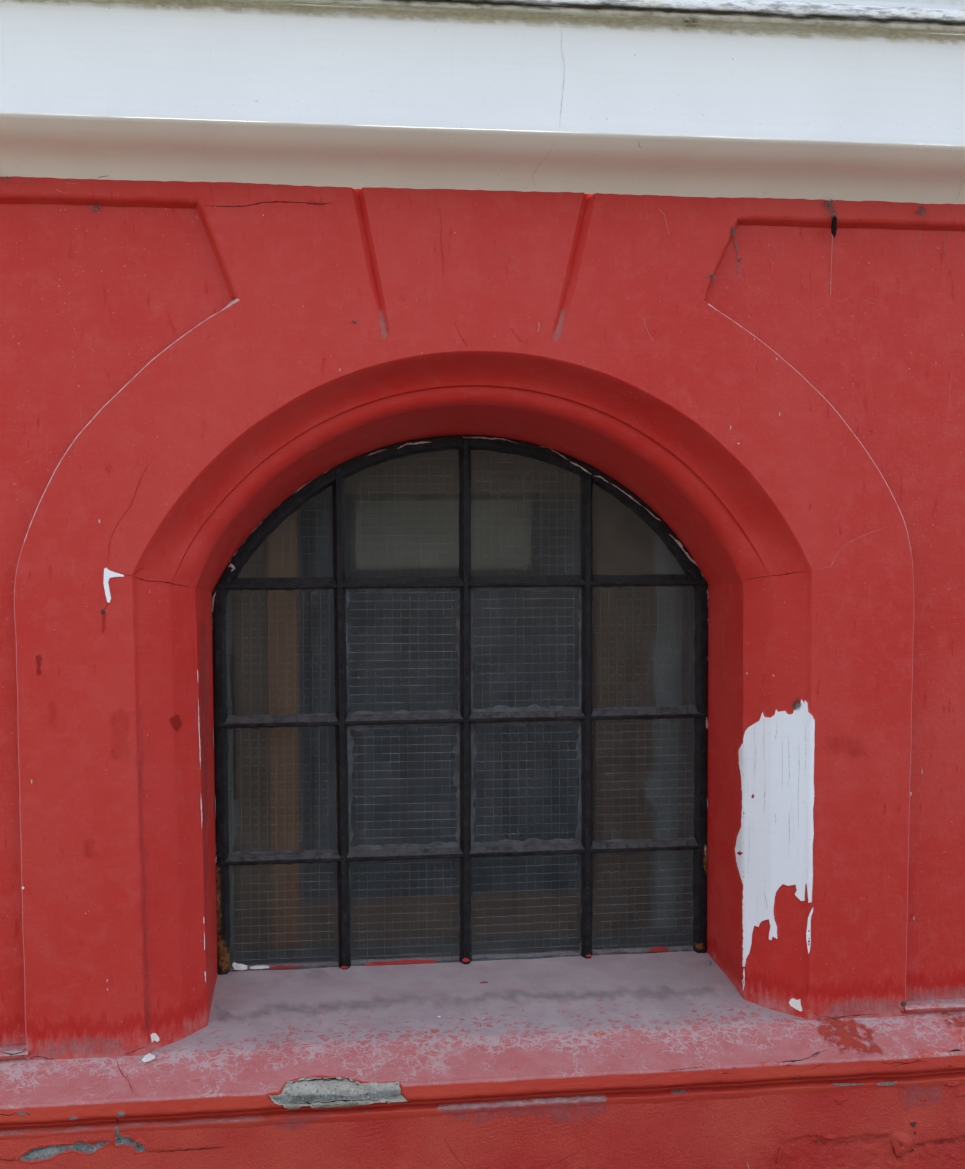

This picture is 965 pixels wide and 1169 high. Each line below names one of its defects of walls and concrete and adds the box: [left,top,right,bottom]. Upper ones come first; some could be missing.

crack [208,200,326,208]
peeling [539,446,661,521]
crack [107,455,195,588]
peeling [733,698,816,990]
peeling [819,1017,882,1053]
spalling [267,1075,407,1109]
peeling [15,1110,147,1164]